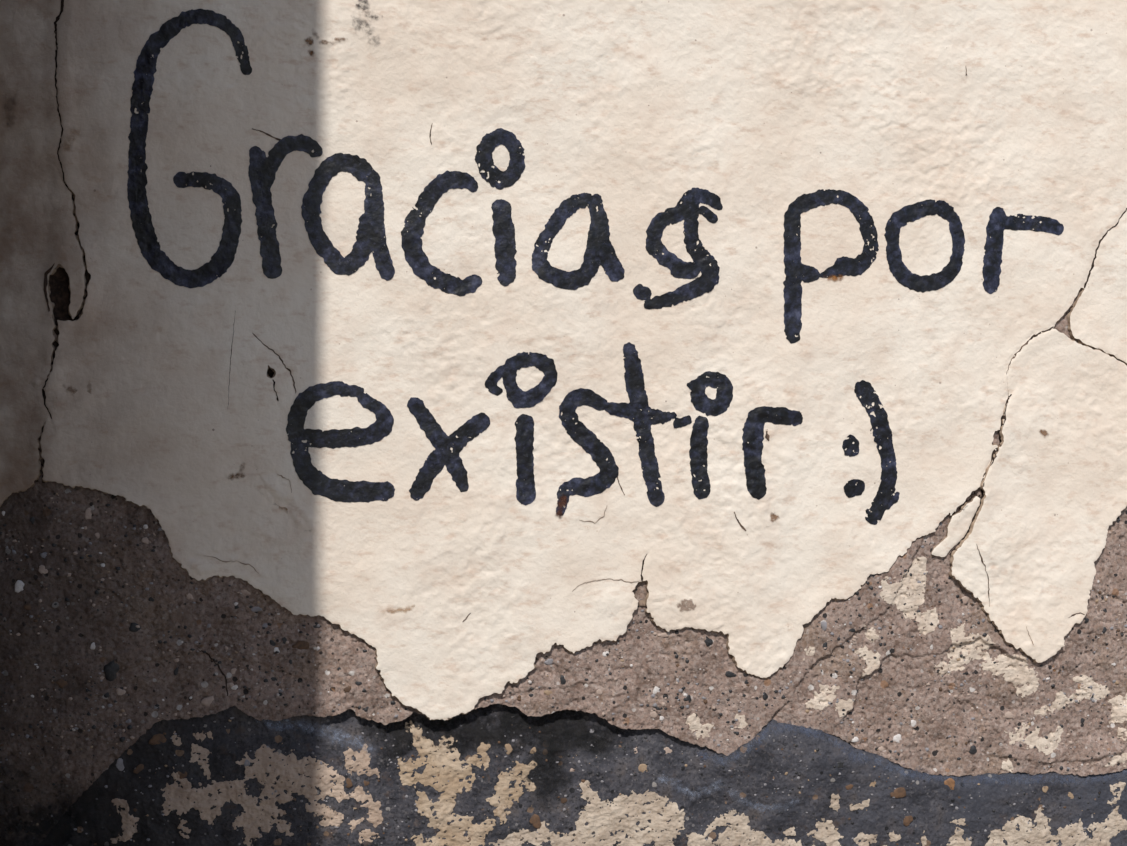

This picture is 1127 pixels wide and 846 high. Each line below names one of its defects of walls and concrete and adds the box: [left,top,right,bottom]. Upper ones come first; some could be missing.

crack [36,0,91,483]
crack [1084,208,1127,288]
spalling [0,437,901,846]
spalling [456,298,1127,846]
crack [949,326,1121,607]